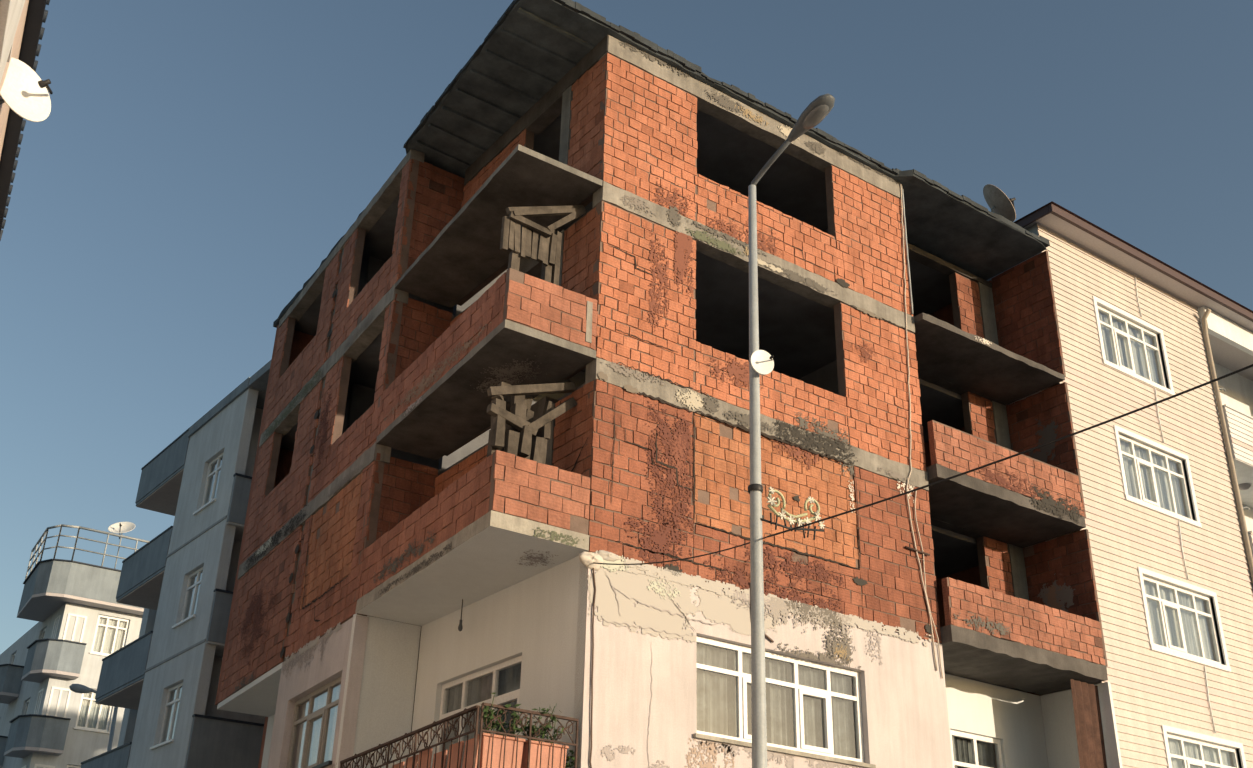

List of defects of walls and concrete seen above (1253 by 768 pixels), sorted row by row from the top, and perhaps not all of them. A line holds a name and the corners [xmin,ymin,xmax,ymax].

water stain [620,177,838,331]
water stain [625,356,883,670]
water stain [978,456,1083,523]
crack [603,574,719,763]
peeling [587,550,938,647]
flaking render [1037,573,1075,612]